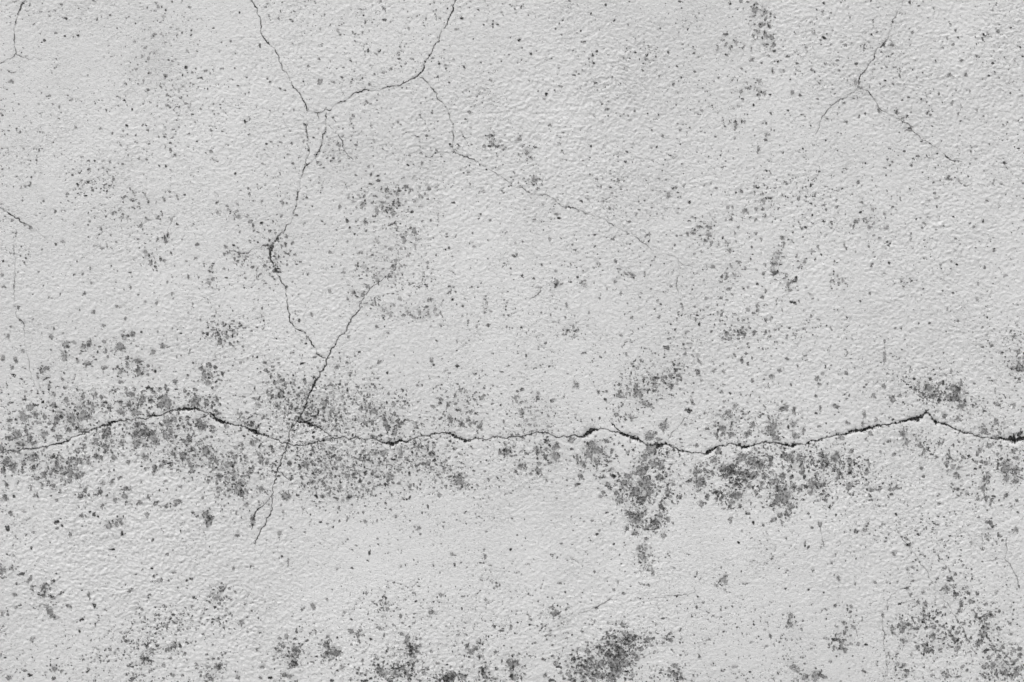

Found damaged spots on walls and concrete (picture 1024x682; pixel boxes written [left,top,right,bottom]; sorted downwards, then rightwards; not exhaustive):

crack [0,0,1024,544]